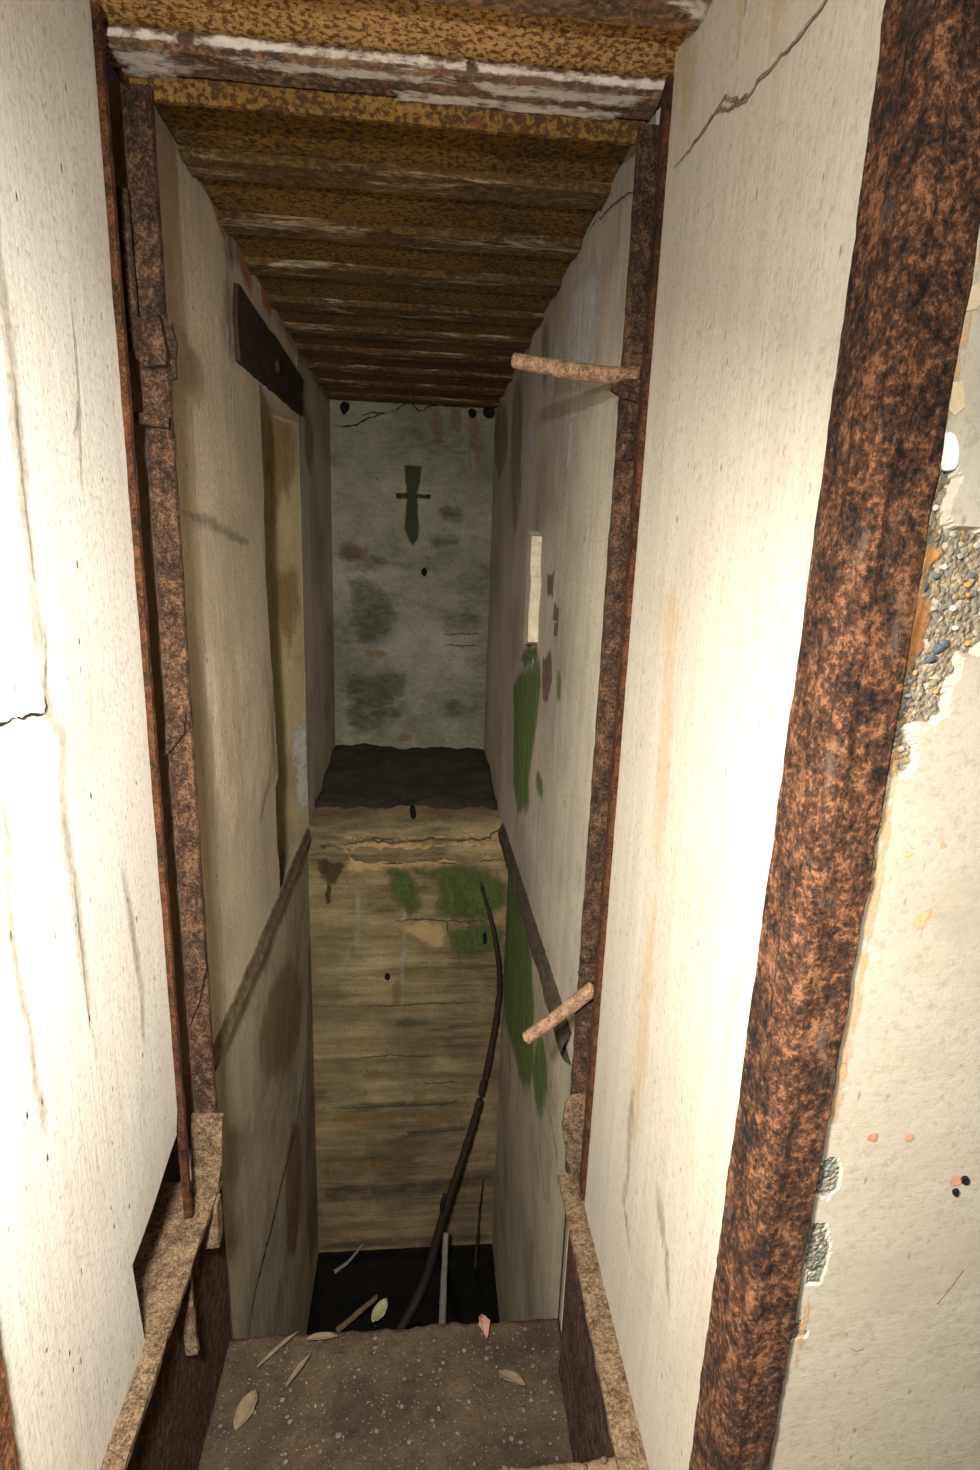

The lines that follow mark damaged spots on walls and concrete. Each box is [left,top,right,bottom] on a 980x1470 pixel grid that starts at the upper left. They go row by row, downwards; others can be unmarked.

crack [673,0,826,169]
crack [590,192,633,231]
crack [13,376,35,582]
rust [905,547,939,671]
crack [0,630,47,726]
spalling [868,472,980,893]
rust [868,804,891,937]
crack [74,886,90,1027]
rust [846,956,867,1035]
spalling [815,1157,840,1197]
spalling [805,1223,829,1283]